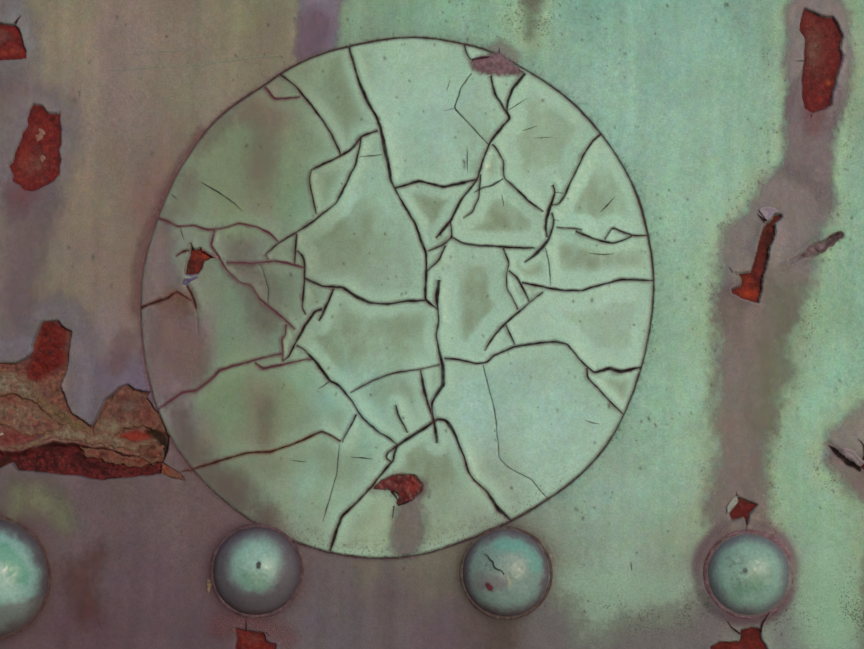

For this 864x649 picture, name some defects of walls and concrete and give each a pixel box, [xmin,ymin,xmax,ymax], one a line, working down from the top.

peeling [0,16,26,61]
peeling [800,9,842,117]
peeling [10,105,61,191]
peeling [186,248,218,275]
peeling [729,206,781,302]
spalling [800,231,843,258]
crack [141,285,199,334]
crack [158,45,653,552]
spalling [0,321,184,480]
peeling [374,474,423,514]
peeling [727,491,757,526]
peeling [710,613,769,649]